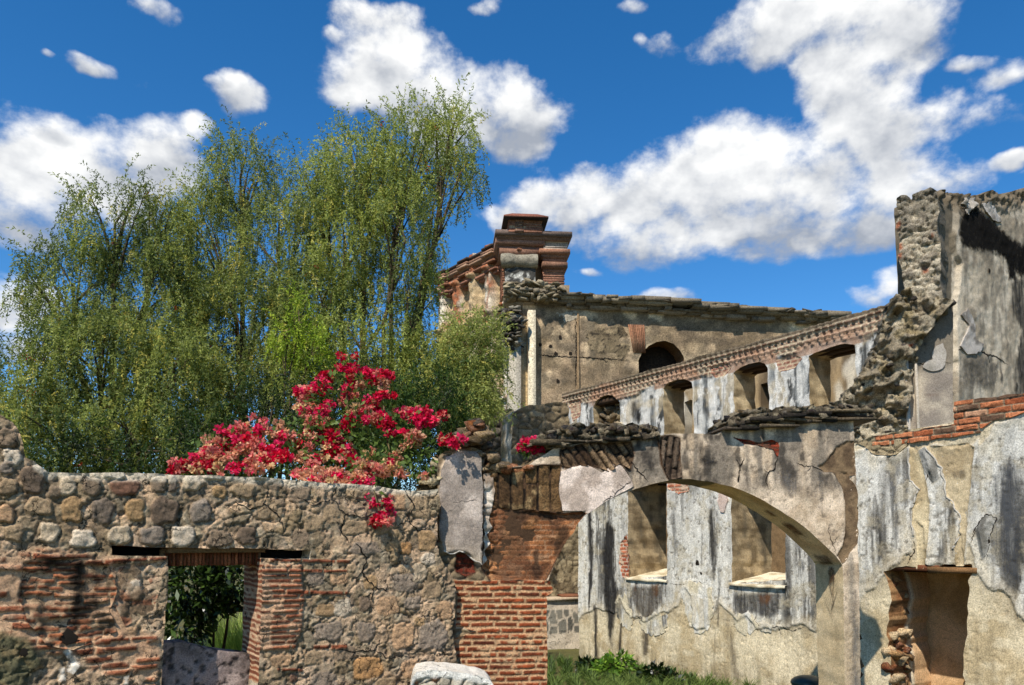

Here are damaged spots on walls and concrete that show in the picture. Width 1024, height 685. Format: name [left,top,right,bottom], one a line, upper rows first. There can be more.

peeling [923,343,947,371]
peeling [960,308,984,354]
crack [737,457,822,487]
crack [299,488,388,601]
flaking render [443,443,633,685]
water stain [701,509,716,577]
flaking render [818,430,974,569]
water stain [995,463,1020,582]
peeling [615,592,668,636]
peeling [679,581,714,634]
peeling [733,611,773,636]